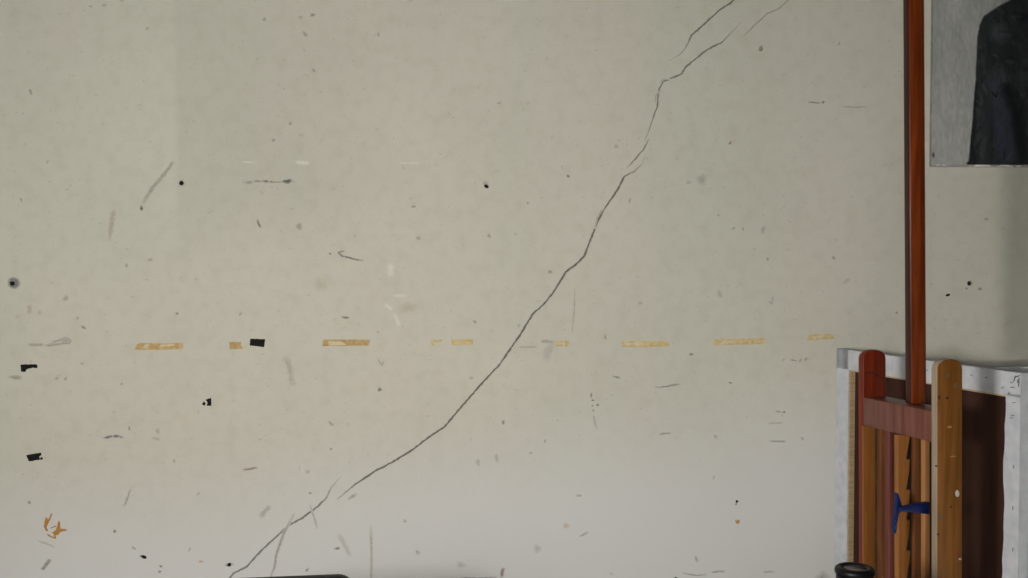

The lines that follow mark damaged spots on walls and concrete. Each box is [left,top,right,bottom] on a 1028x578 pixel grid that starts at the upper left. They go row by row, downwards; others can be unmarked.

crack [229,0,789,578]